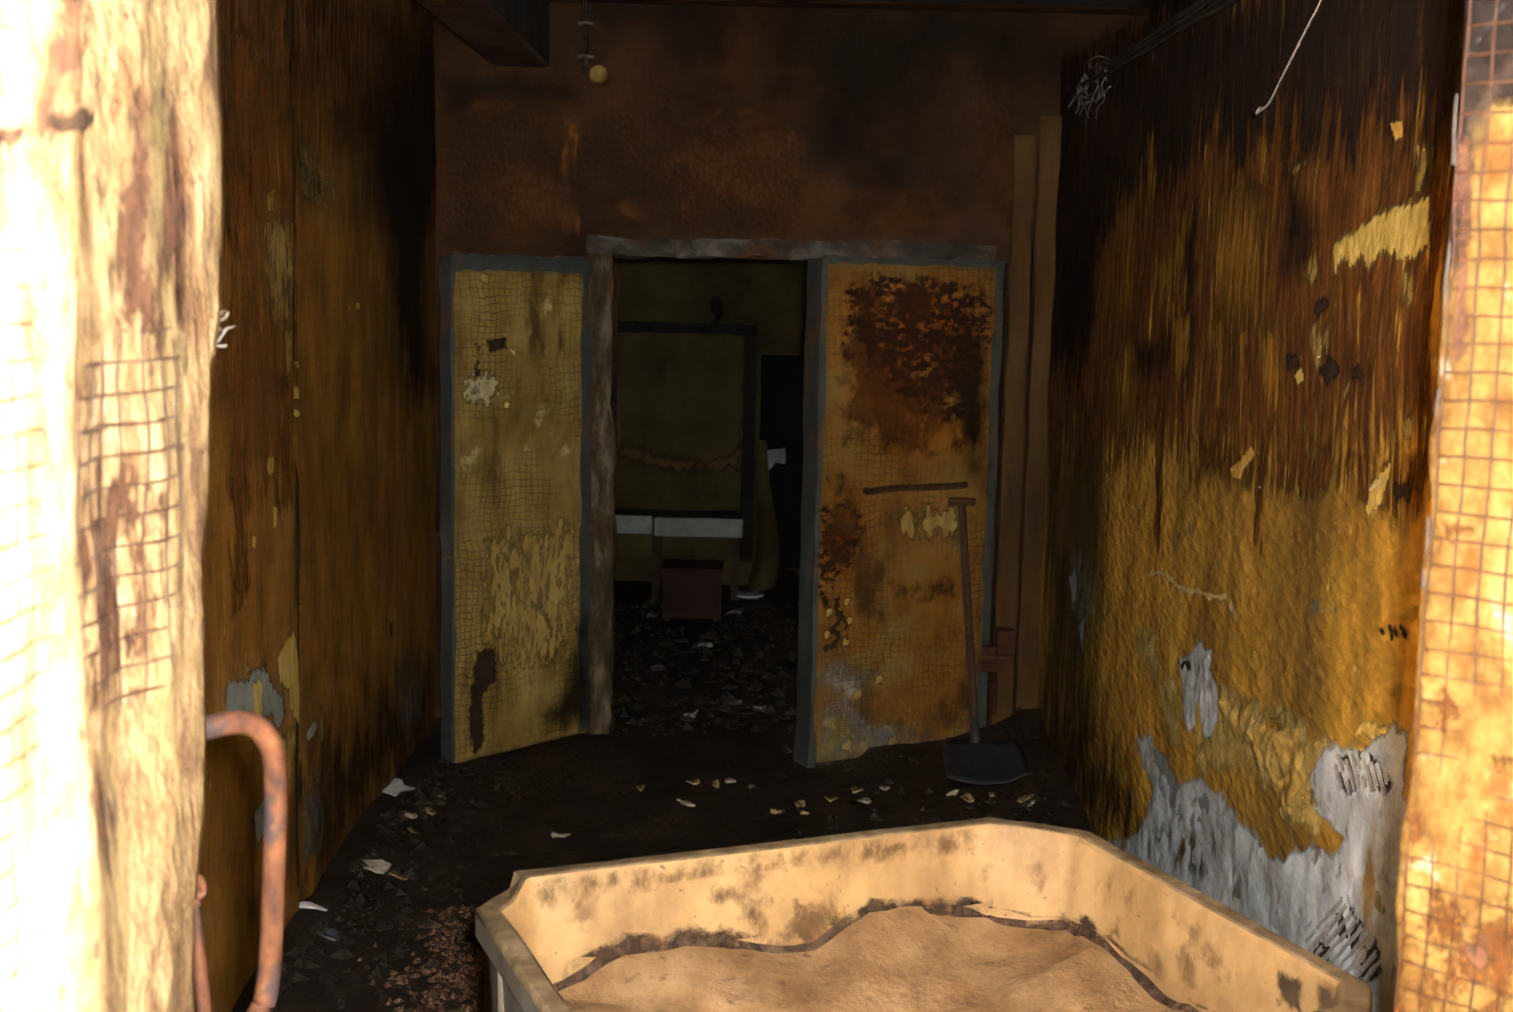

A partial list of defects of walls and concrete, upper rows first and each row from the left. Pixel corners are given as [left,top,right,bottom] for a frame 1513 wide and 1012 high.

peeling [1206,121,1434,429]
peeling [462,337,517,408]
corrosion [842,272,993,421]
peeling [1230,447,1255,480]
peeling [1366,463,1411,518]
water stain [468,647,496,755]
flaking render [1107,626,1408,1012]